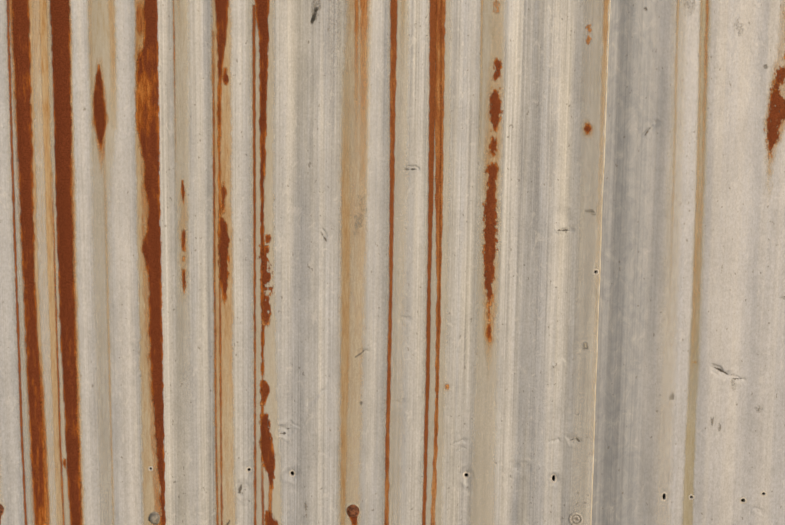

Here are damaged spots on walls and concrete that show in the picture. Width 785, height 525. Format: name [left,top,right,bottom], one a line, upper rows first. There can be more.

rust [7,0,50,525]
rust [50,0,84,525]
rust [92,64,108,165]
rust [135,0,166,525]
rust [211,0,236,525]
rust [251,0,281,525]
rust [384,0,407,525]
rust [422,0,450,525]
rust [482,57,503,357]
rust [764,56,785,173]